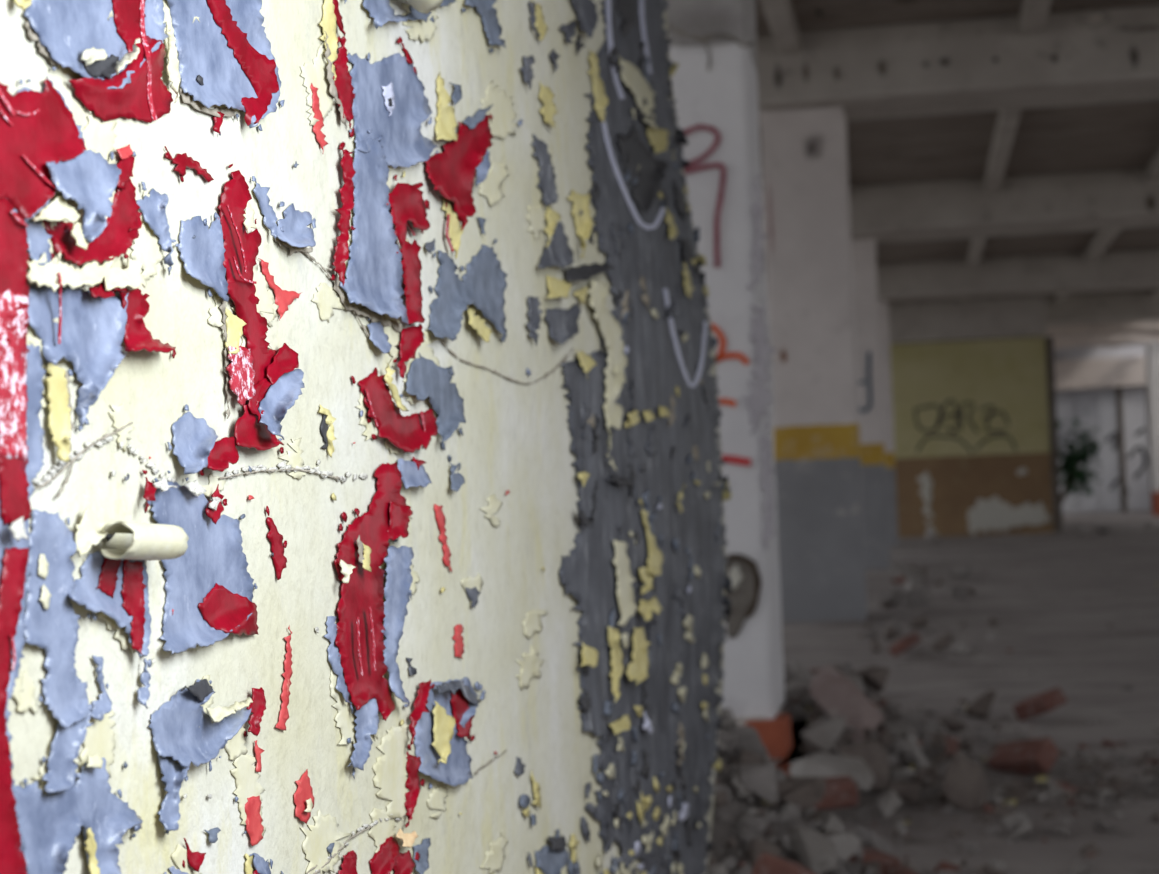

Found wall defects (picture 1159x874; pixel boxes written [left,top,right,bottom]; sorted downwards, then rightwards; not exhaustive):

peeling [519,55,558,128]
crack [441,339,573,384]
crack [32,422,177,498]
crack [219,460,368,483]
peeling [526,0,761,874]
spalling [917,471,940,537]
spalling [967,495,1051,535]
peeling [514,757,542,825]
crack [306,814,401,874]